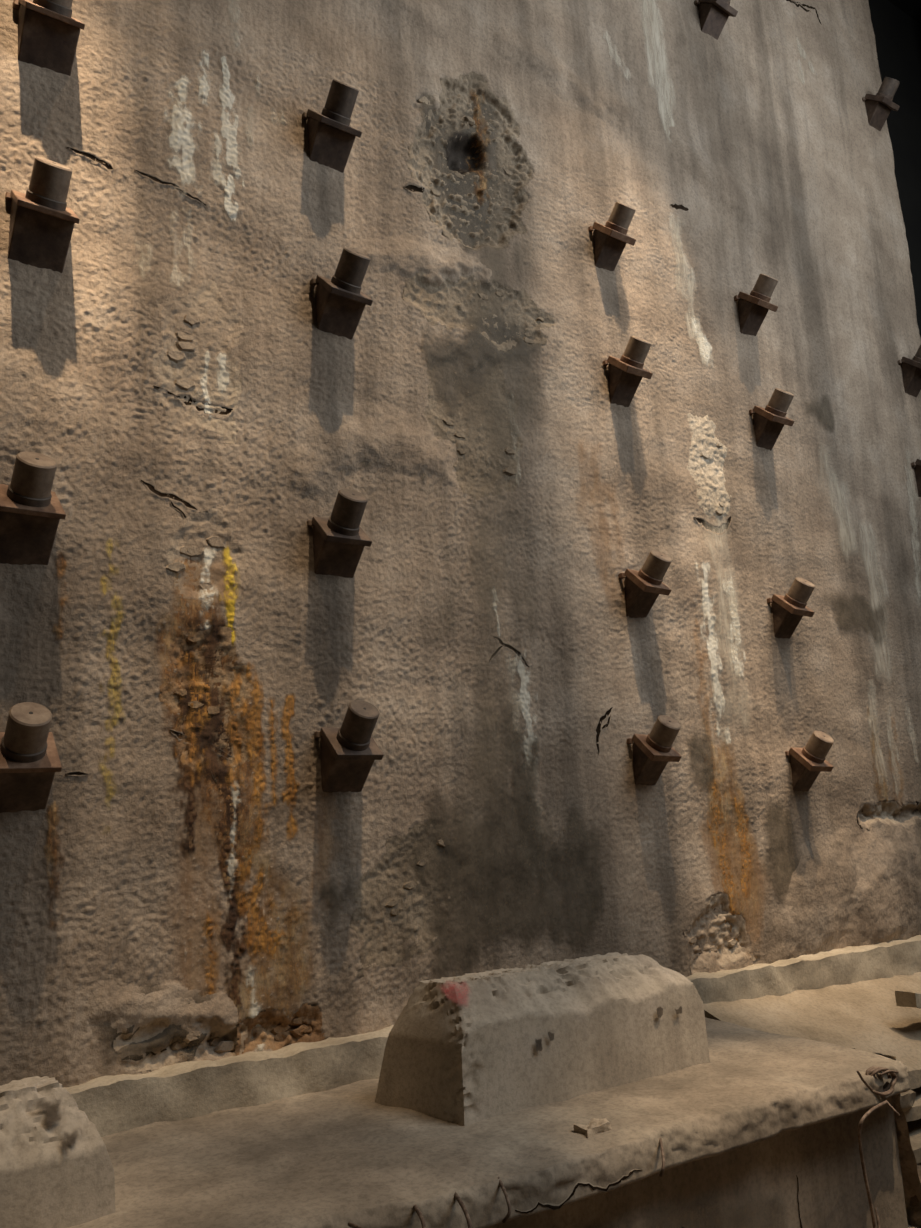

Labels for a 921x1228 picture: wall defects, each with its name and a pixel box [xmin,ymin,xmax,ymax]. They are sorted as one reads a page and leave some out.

crack [785,0,822,25]
leakage [169,52,252,220]
spalling [406,71,533,252]
leakage [689,563,745,787]
corrosion [158,558,312,1050]
spalling [858,801,921,830]